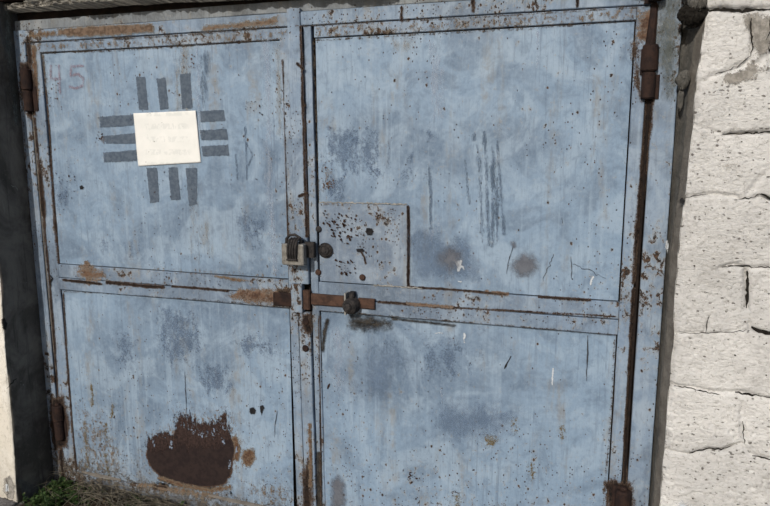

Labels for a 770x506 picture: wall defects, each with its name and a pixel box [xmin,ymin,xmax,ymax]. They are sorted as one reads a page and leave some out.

rust [19,16,292,494]
rust [246,310,381,506]
rust [281,0,659,506]